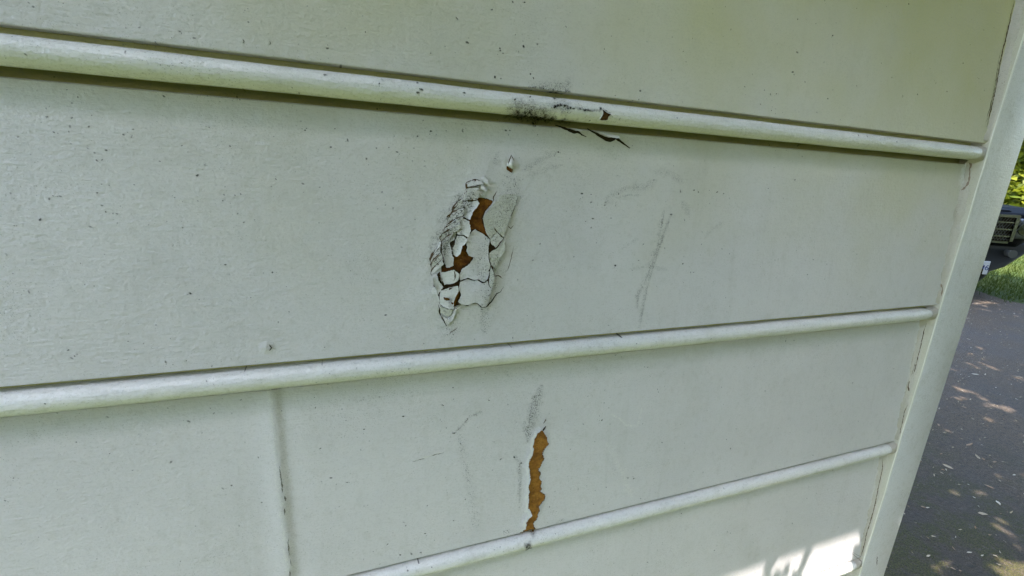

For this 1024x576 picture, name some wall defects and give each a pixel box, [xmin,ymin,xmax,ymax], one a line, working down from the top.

crack [555,125,630,148]
peeling [404,150,534,335]
peeling [504,394,552,537]